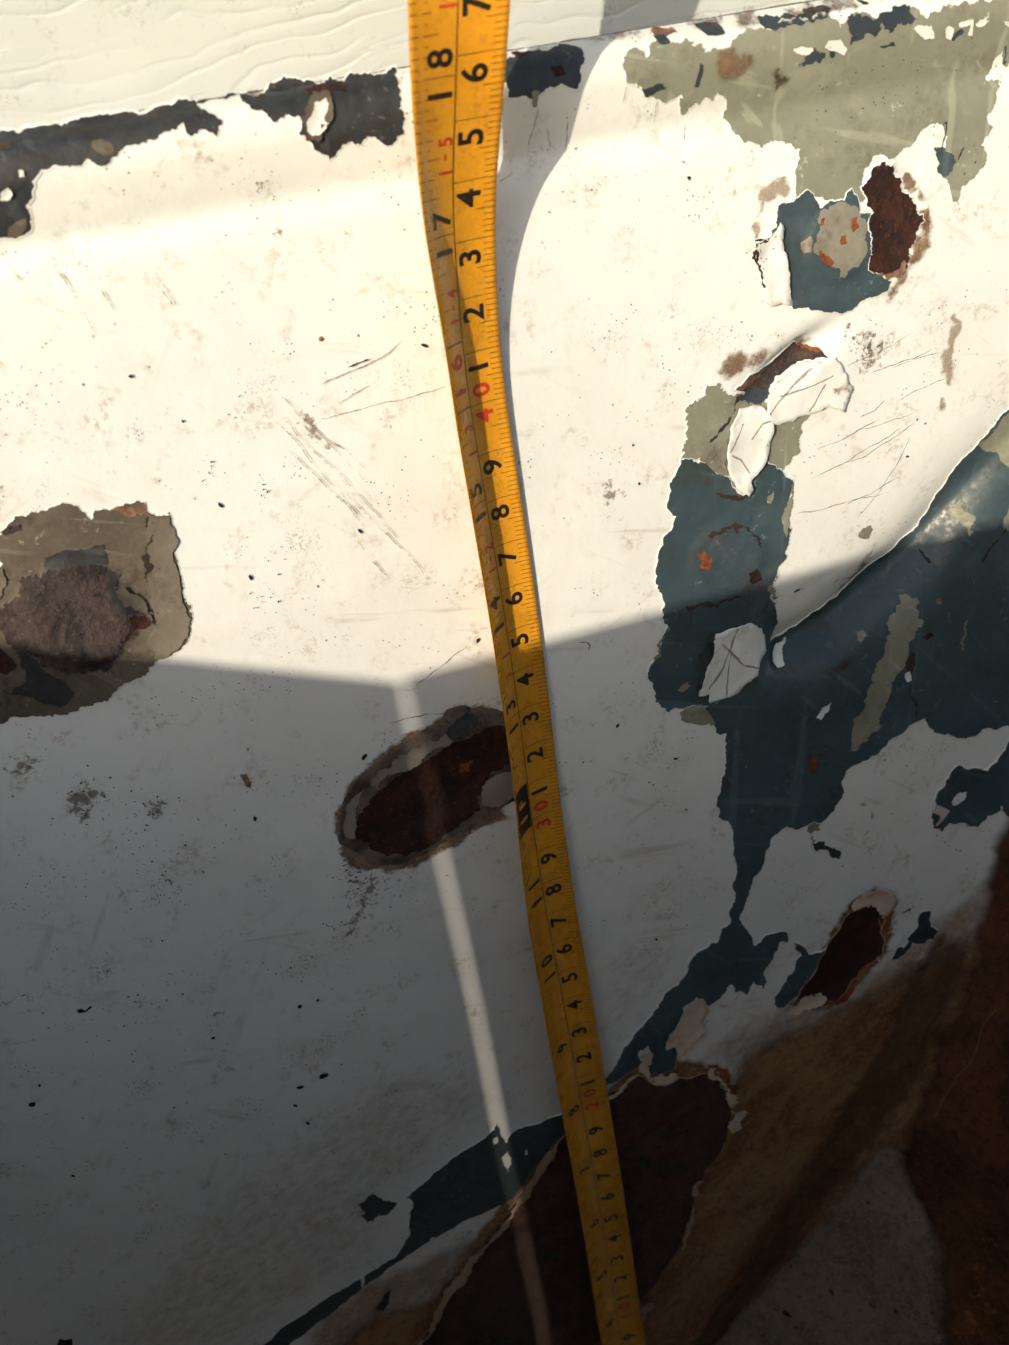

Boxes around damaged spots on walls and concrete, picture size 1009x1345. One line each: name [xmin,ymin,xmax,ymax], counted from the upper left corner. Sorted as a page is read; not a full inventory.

peeling [0,65,407,241]
peeling [505,42,586,108]
peeling [620,0,1009,316]
corrosion [889,173,931,299]
corrosion [720,352,767,391]
corrosion [795,337,822,353]
peeling [0,500,194,725]
corrosion [335,705,510,873]
peeling [605,381,1009,1085]
corrosion [608,825,1009,1345]
peeling [262,1113,565,1345]
corrosion [441,1137,562,1295]